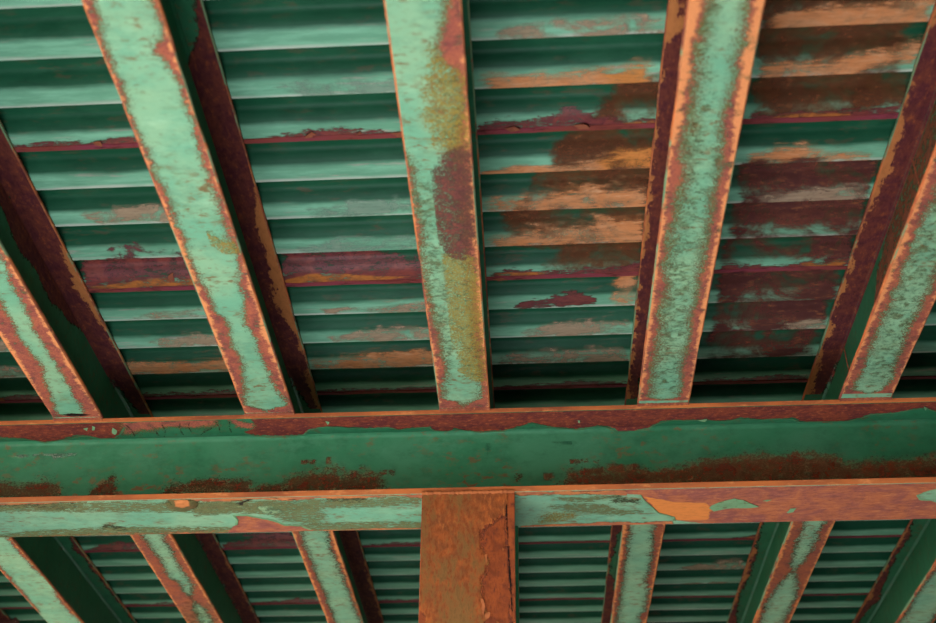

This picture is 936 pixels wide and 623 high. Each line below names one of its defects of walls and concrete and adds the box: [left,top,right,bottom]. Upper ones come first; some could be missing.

corrosion [0,0,936,437]
peeling [0,422,126,443]
corrosion [0,473,76,506]
corrosion [87,475,119,502]
corrosion [160,457,422,502]
corrosion [514,446,936,496]
peeling [576,483,936,523]
peeling [419,493,509,623]